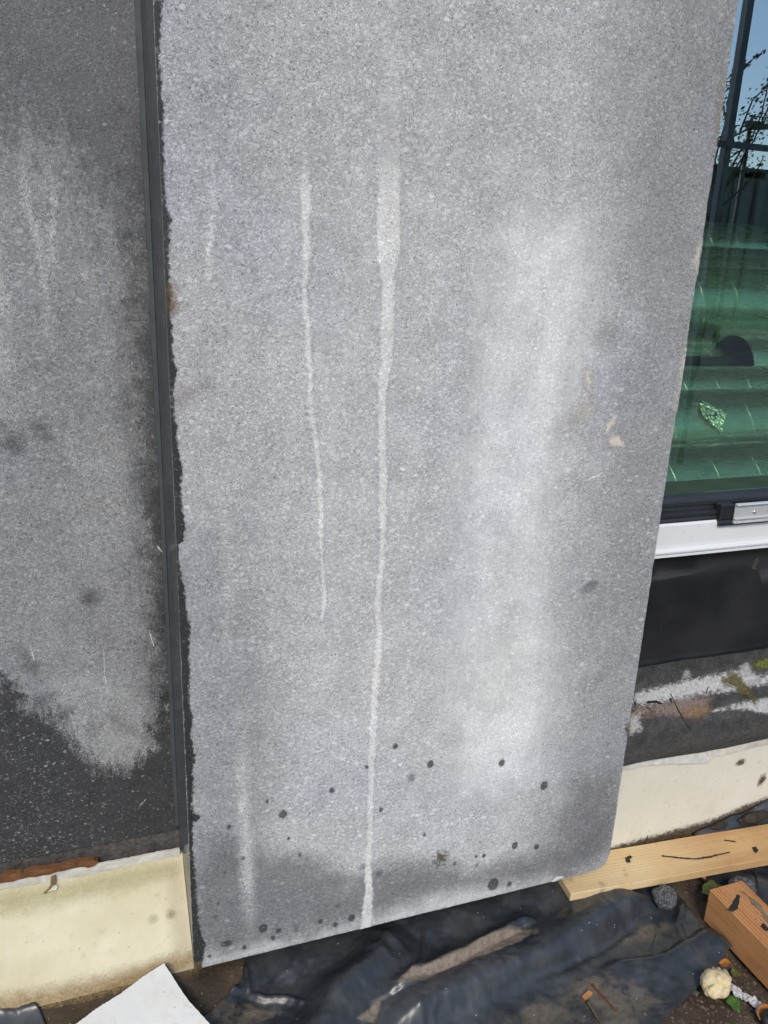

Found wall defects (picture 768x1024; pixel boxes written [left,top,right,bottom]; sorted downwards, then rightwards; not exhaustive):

leakage [0,0,609,970]